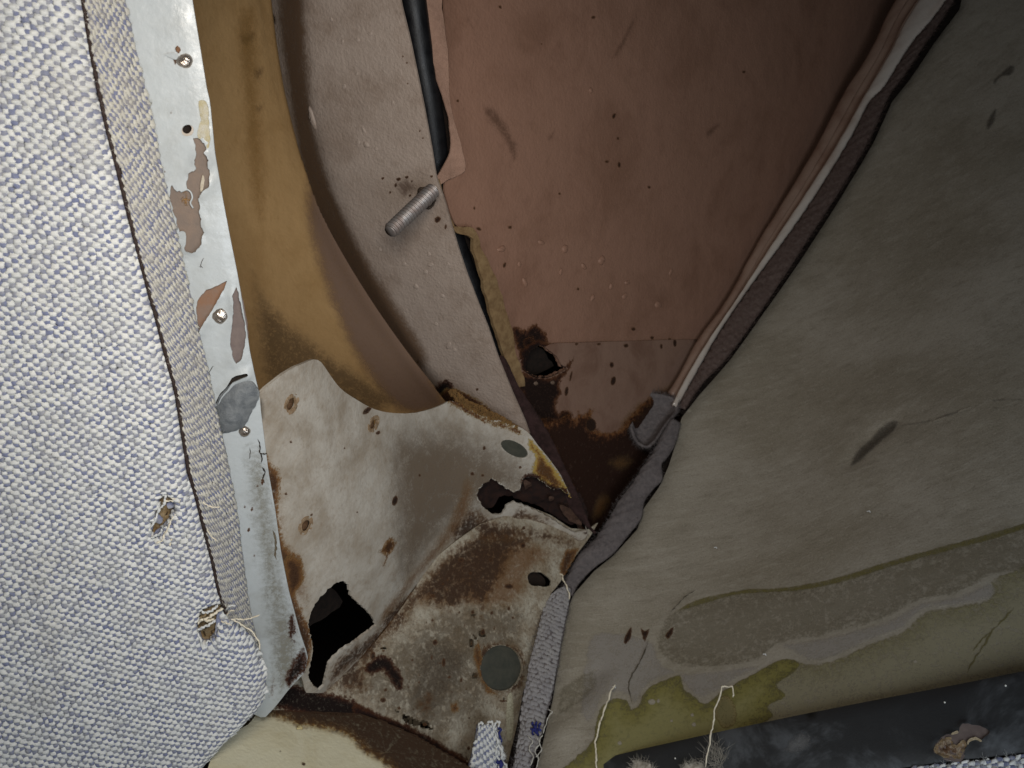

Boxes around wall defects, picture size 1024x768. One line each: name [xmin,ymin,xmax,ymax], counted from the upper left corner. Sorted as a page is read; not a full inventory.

peeling [170,138,210,253]
peeling [196,281,248,363]
rust [267,324,672,768]
water stain [683,524,1024,609]
crack [628,644,648,701]
water stain [565,568,1024,768]
crack [968,611,1011,671]